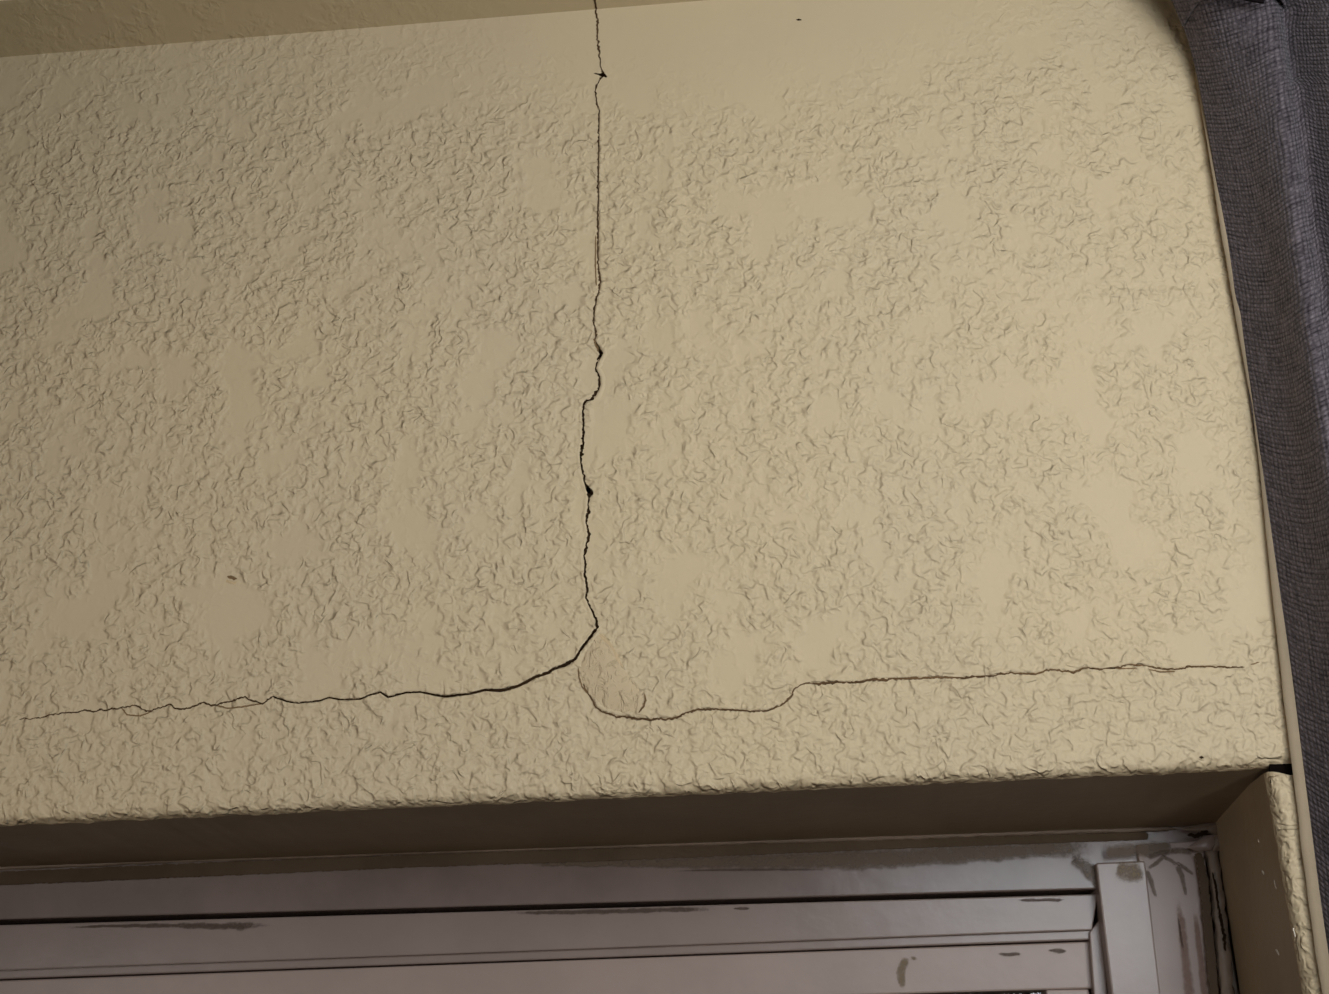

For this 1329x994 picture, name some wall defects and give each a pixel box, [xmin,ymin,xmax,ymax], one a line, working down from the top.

crack [20,0,1259,721]